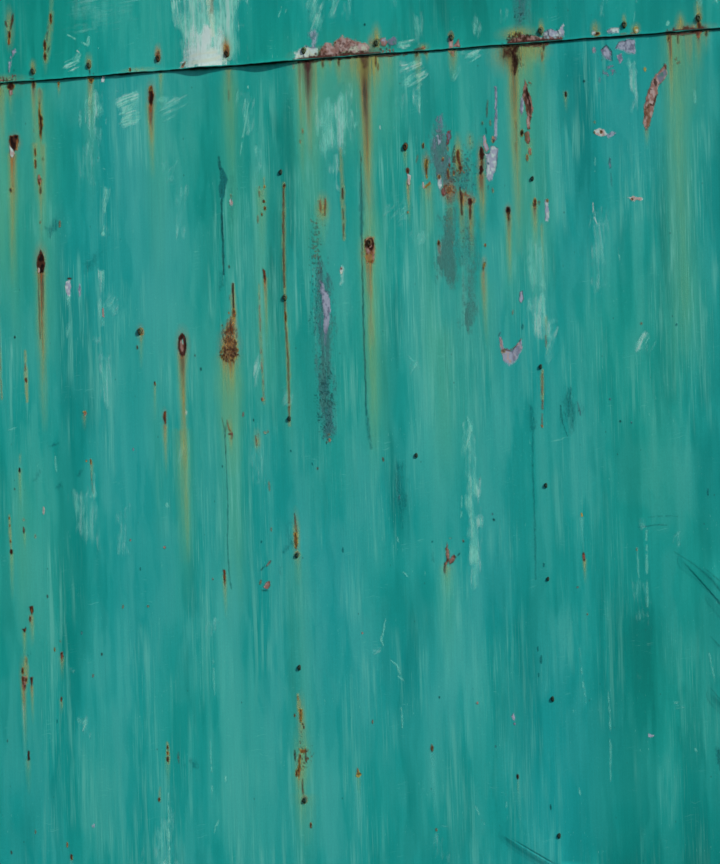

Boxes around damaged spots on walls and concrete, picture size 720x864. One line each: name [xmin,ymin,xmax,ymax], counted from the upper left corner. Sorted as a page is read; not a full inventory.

rust [9,135,19,192]
peeling [295,33,381,59]
rust [298,35,425,173]
peeling [438,157,455,196]
peeling [482,87,498,190]
rust [502,42,549,118]
peeling [520,81,533,161]
peeling [643,64,668,128]
rust [37,250,45,341]
rust [178,333,187,407]
rust [220,283,239,379]
peeling [499,337,522,364]